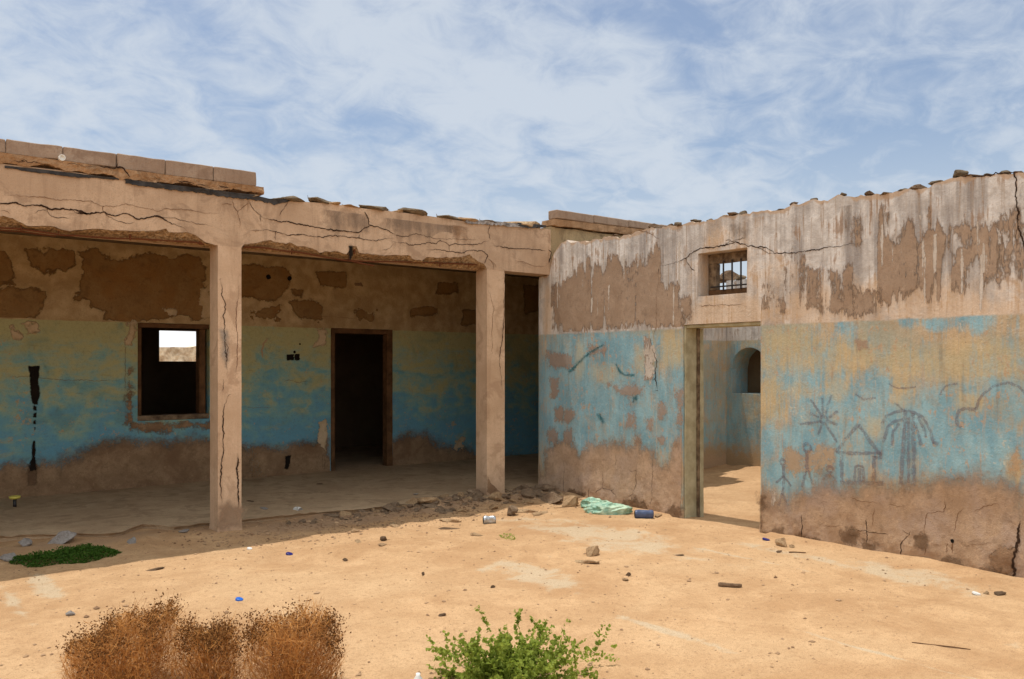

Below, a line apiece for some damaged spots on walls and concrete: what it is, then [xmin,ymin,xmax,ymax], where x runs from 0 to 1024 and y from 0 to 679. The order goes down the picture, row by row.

peeling [0,216,213,346]
crack [0,163,544,385]
spalling [241,240,486,323]
crack [650,238,852,391]
peeling [761,202,1024,319]
crack [972,172,1024,247]
crack [220,285,271,498]
peeling [539,242,692,518]
crack [801,498,1020,577]